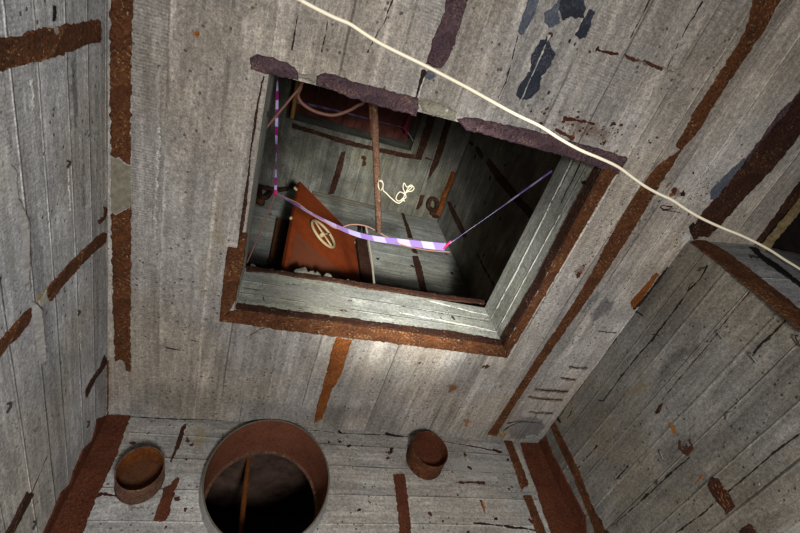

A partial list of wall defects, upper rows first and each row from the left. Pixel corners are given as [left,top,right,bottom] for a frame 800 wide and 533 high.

rust [666,163,718,216]
rust [696,475,735,515]